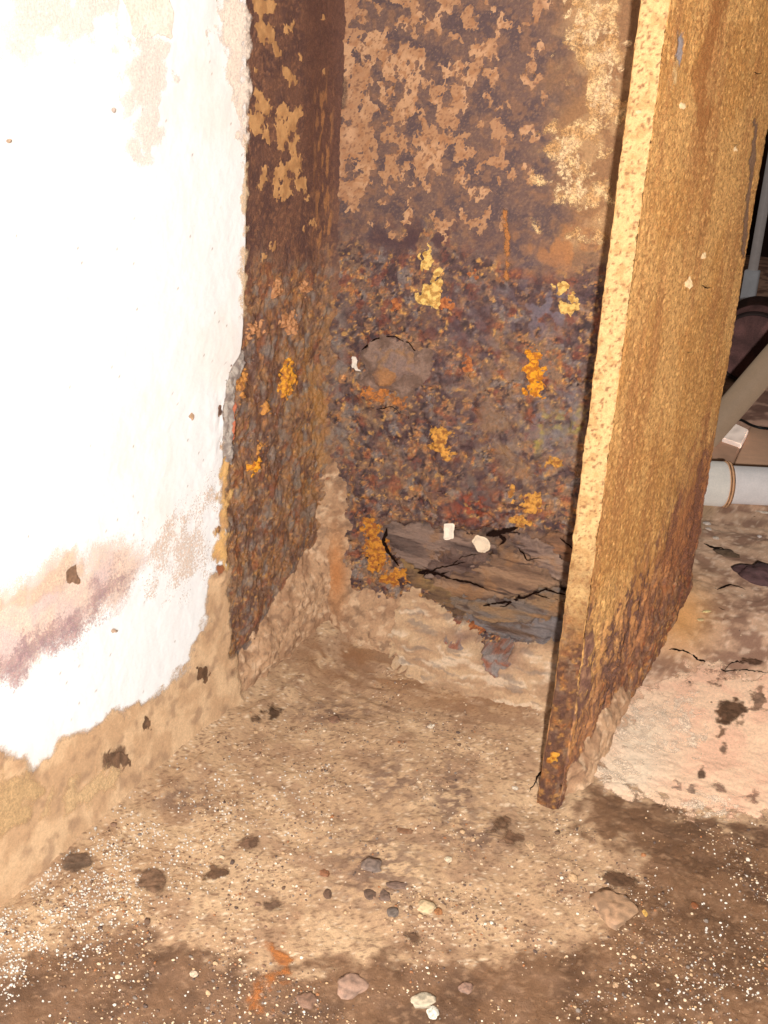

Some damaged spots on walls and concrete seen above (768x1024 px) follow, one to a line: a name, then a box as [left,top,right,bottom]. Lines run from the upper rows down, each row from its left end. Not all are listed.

rust [219,0,252,150]
rust [415,244,455,311]
rust [551,281,580,317]
rust [259,357,298,415]
rust [521,344,547,400]
rust [427,426,458,462]
spalling [66,565,80,585]
peeling [444,523,455,540]
rust [359,484,573,644]
crack [382,527,566,607]
peeling [472,535,490,553]
damp [0,486,245,907]